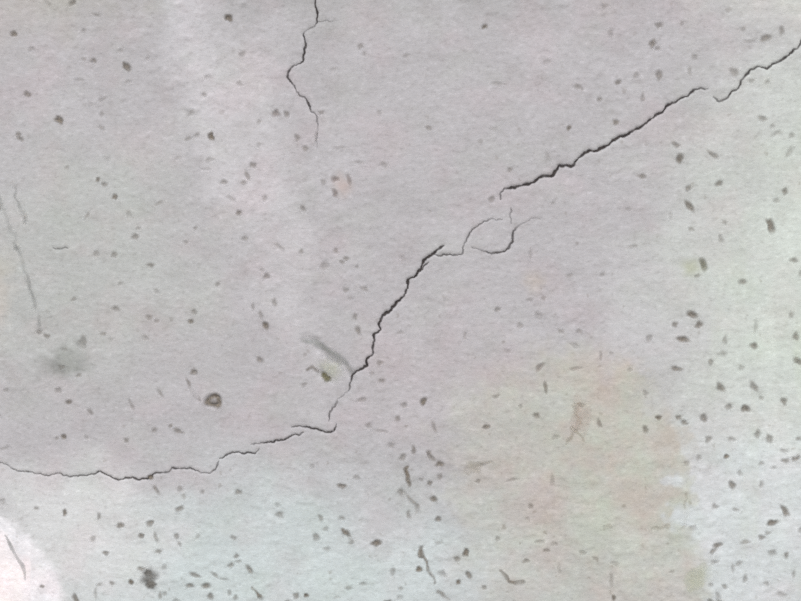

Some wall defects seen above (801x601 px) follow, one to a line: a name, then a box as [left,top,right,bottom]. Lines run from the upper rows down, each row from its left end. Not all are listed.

crack [287,0,318,110]
crack [722,40,801,101]
crack [503,87,704,190]
crack [349,245,461,386]
crack [27,414,336,480]